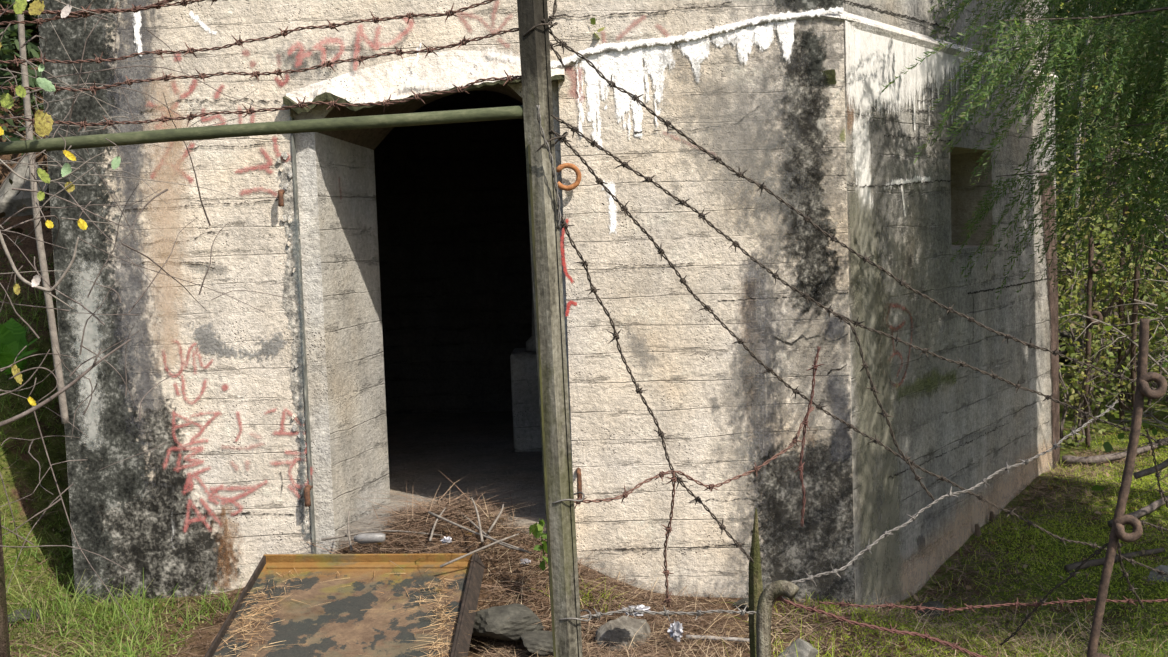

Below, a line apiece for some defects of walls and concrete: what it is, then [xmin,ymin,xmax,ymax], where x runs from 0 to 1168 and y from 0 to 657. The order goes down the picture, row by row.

leakage [38,0,244,603]
leakage [550,0,992,609]